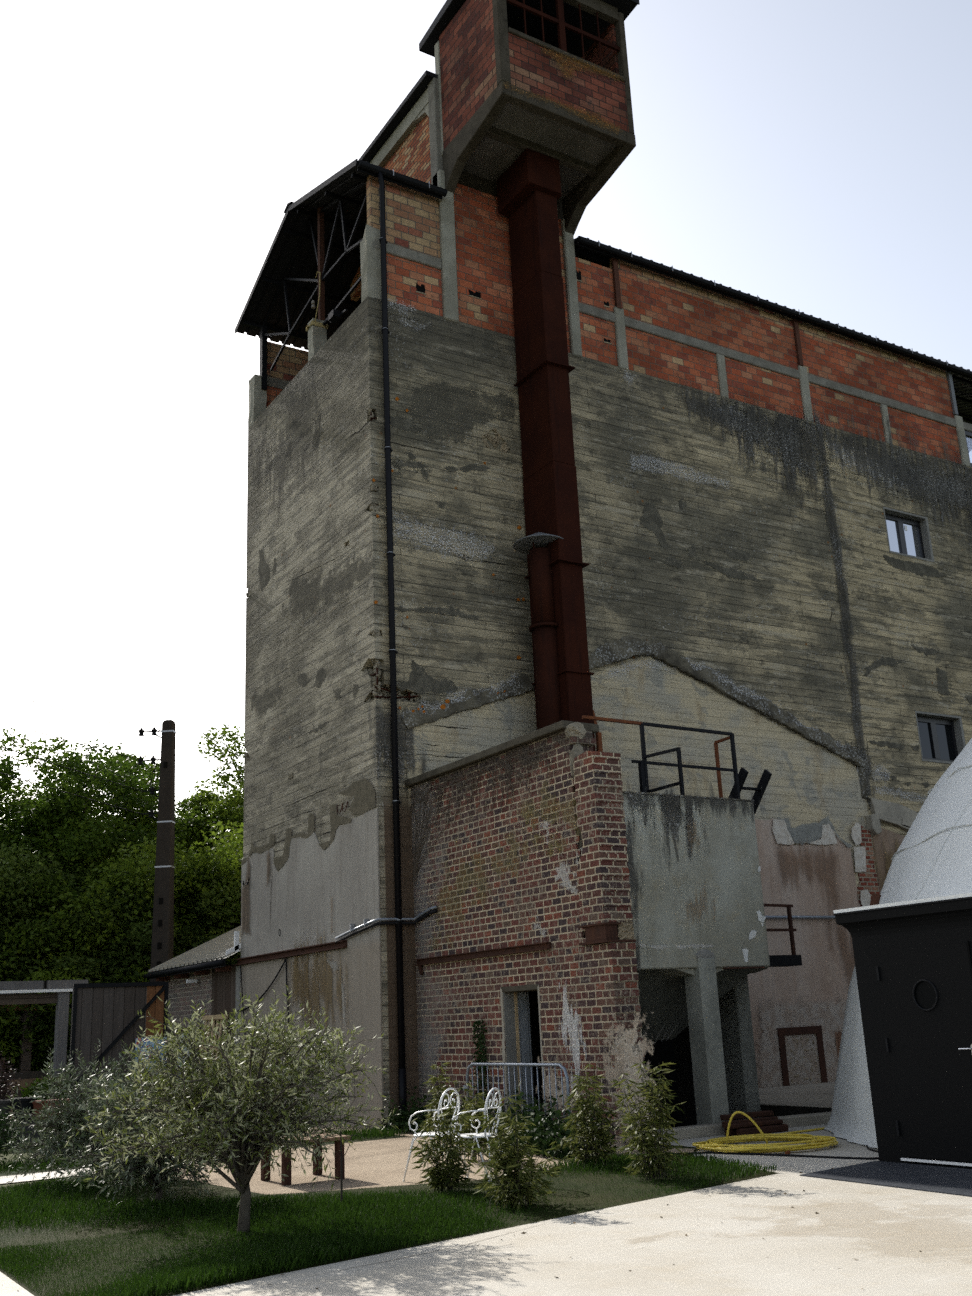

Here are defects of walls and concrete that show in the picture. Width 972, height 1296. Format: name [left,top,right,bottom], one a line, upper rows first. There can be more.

peeling [297,659,457,703]
leakage [682,387,972,802]
peeling [240,778,384,1129]
leakage [626,784,754,918]
peeling [747,816,879,1088]
spalling [760,1105,832,1117]